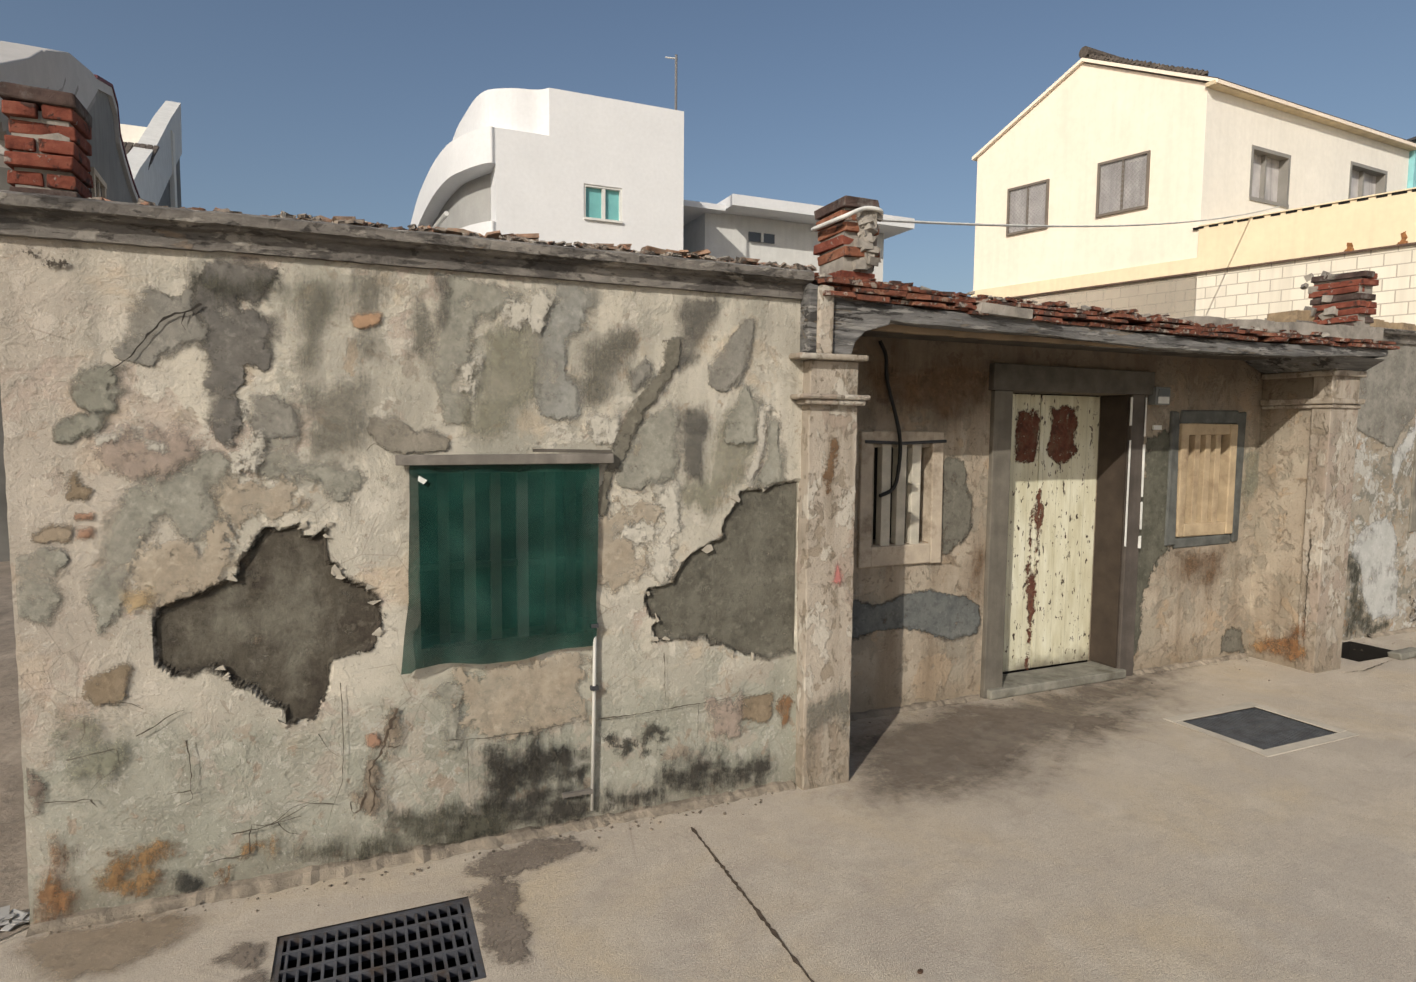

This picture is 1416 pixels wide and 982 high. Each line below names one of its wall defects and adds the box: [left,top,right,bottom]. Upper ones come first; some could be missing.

crack [106,303,202,373]
peeling [1392,419,1416,487]
flaking render [125,398,386,728]
flaking render [597,405,797,660]
peeling [1351,515,1416,622]
damp [300,723,770,860]